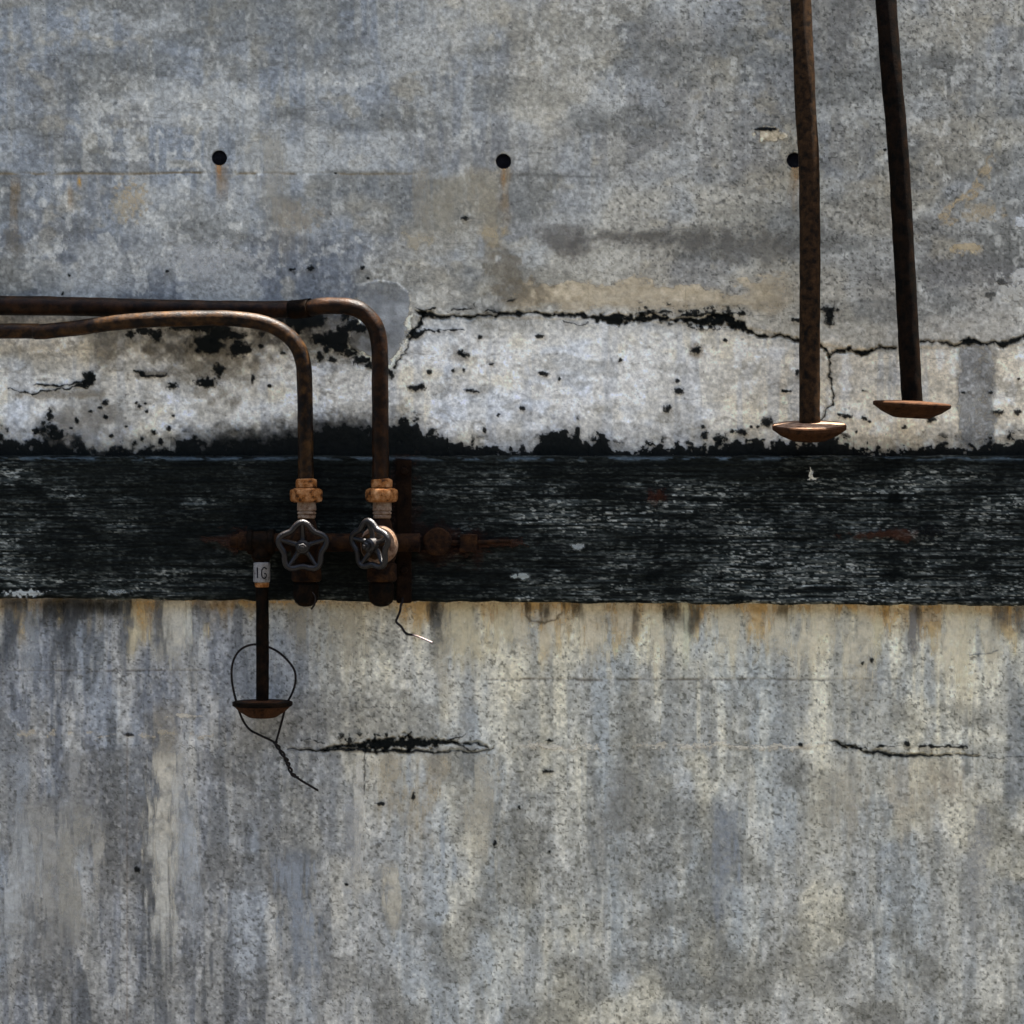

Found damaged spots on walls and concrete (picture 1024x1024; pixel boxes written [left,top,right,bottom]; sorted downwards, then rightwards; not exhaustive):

flaking render [348,319,372,361]
flaking render [354,266,413,369]
crack [393,299,1024,420]
damp [3,600,192,669]
damp [403,602,1024,682]
damp [4,811,104,936]
damp [142,754,198,940]
damp [346,763,365,873]
crack [287,731,494,806]
crack [832,740,1022,759]